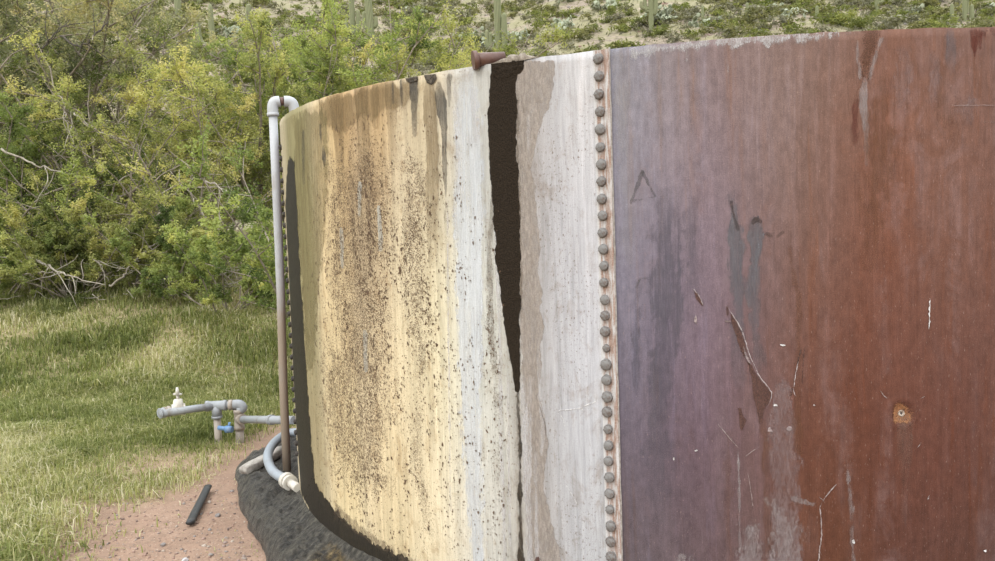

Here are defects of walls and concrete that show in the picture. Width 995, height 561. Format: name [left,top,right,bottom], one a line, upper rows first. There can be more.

leakage [392,76,418,111]
leakage [435,93,447,155]
corrosion [860,30,880,80]
corrosion [970,29,986,57]
leakage [285,157,409,561]
leakage [453,119,483,531]
leakage [491,53,561,561]
peeling [725,306,777,432]